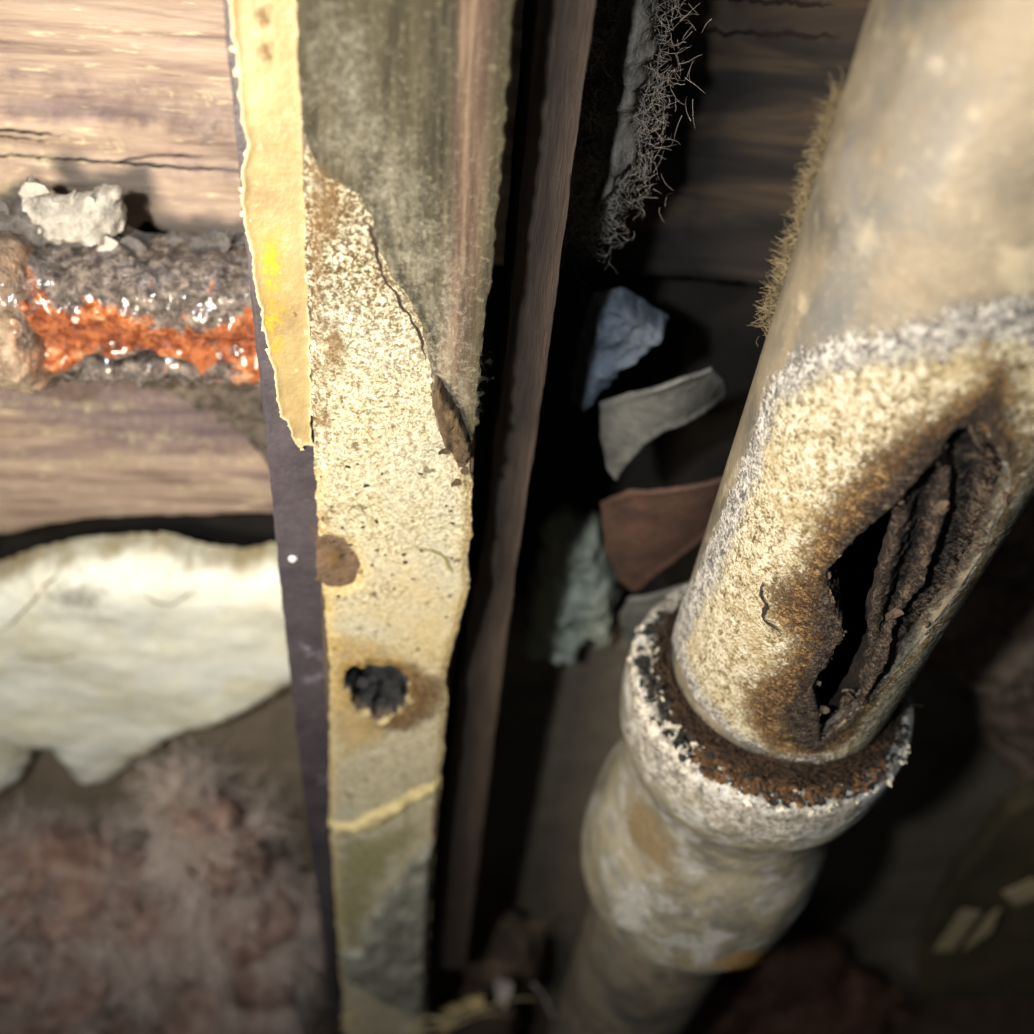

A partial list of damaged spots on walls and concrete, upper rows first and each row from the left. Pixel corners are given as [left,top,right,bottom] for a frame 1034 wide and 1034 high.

peeling [451,467,469,487]
peeling [314,535,360,587]
rust [738,339,1034,760]